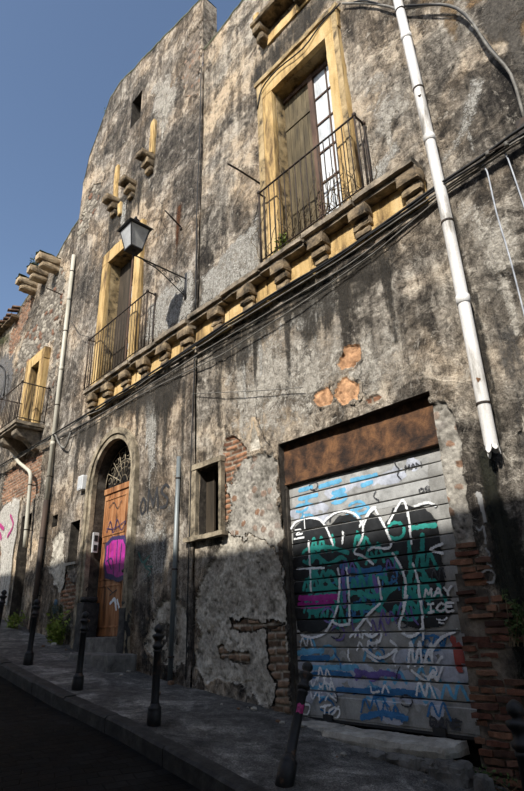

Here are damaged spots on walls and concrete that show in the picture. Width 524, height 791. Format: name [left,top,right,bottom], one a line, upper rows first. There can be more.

flaking render [1,448,44,508]
spalling [141,416,291,724]
water stain [210,231,399,439]
spalling [311,340,387,411]
flaking render [428,396,524,791]